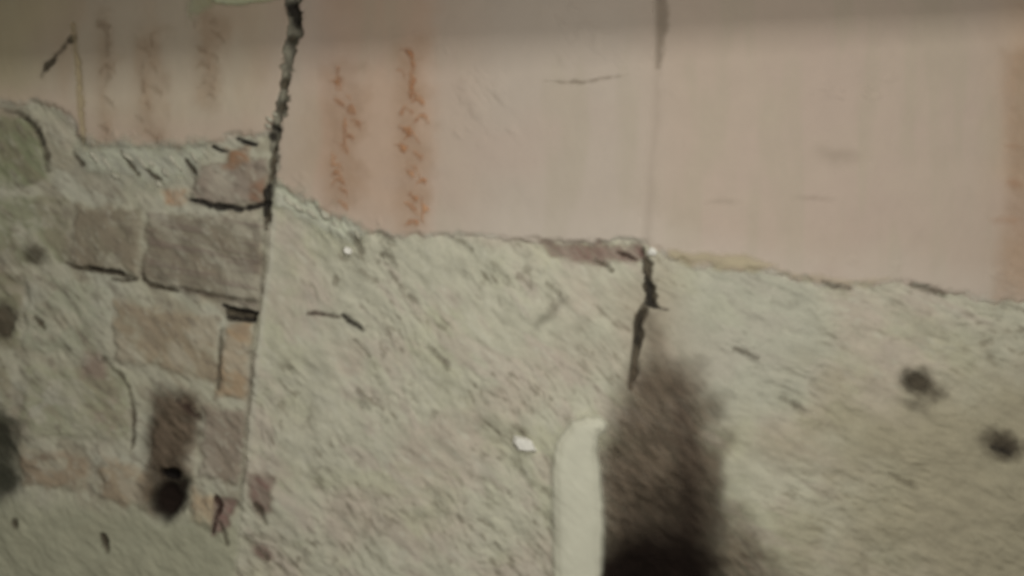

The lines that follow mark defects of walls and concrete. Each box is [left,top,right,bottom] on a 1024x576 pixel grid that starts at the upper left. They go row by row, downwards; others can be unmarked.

crack [190,0,303,225]
spalling [76,141,209,187]
spalling [272,181,366,255]
spalling [548,242,657,266]
crack [629,248,667,389]